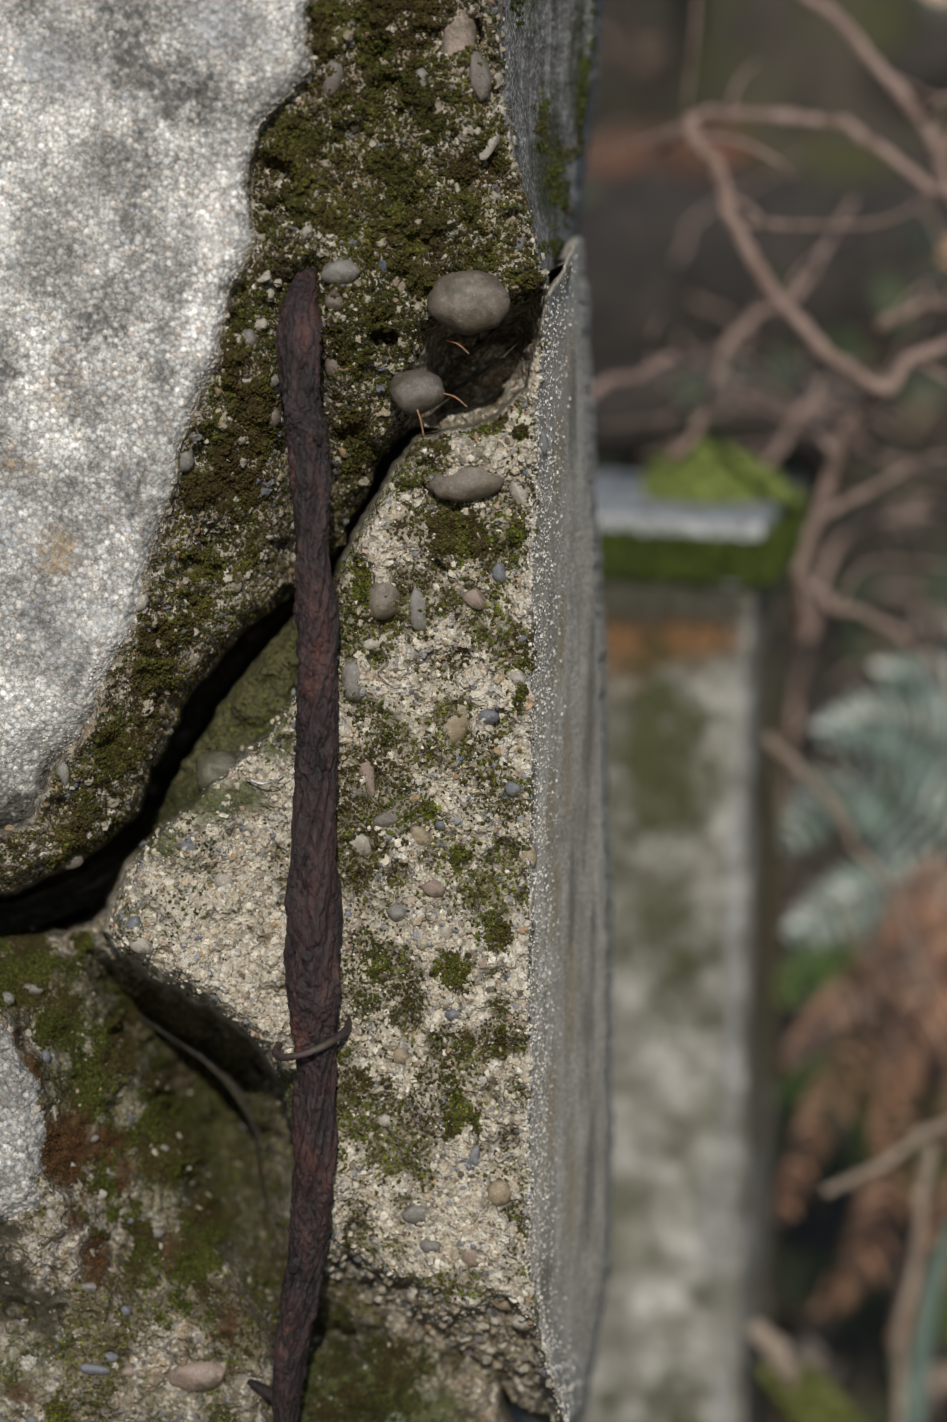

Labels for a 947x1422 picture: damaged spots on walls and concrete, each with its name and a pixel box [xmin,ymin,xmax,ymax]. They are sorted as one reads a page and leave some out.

crack [548,264,572,287]
crack [329,320,529,573]
crack [0,736,201,933]
spalling [0,0,570,1422]
rust [247,265,343,1422]